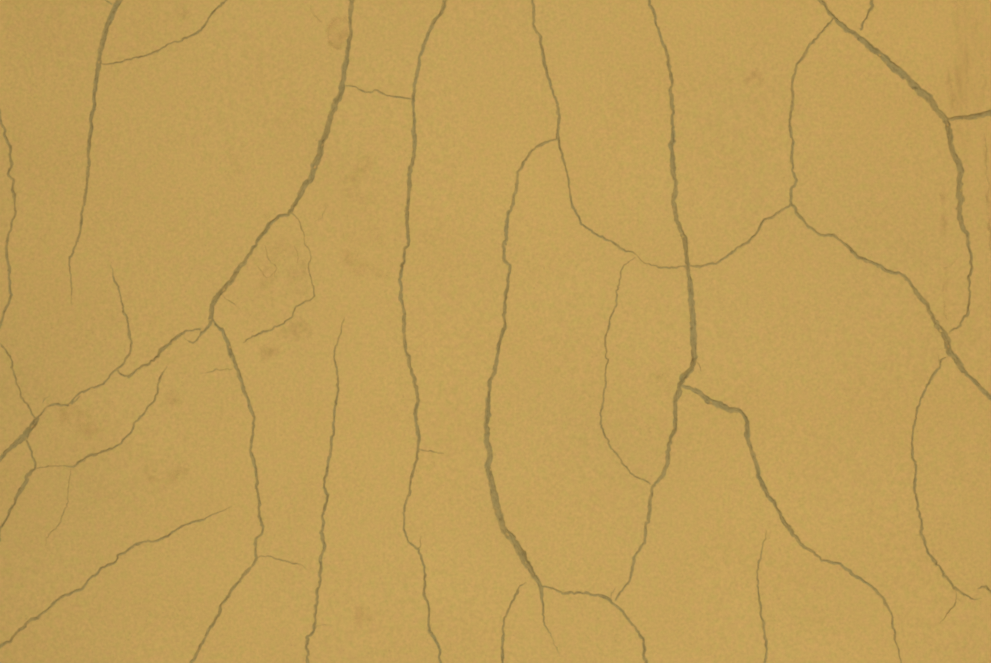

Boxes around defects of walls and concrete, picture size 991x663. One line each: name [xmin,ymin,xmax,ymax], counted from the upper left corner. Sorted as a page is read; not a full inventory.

crack [0,0,447,663]
crack [483,0,991,663]